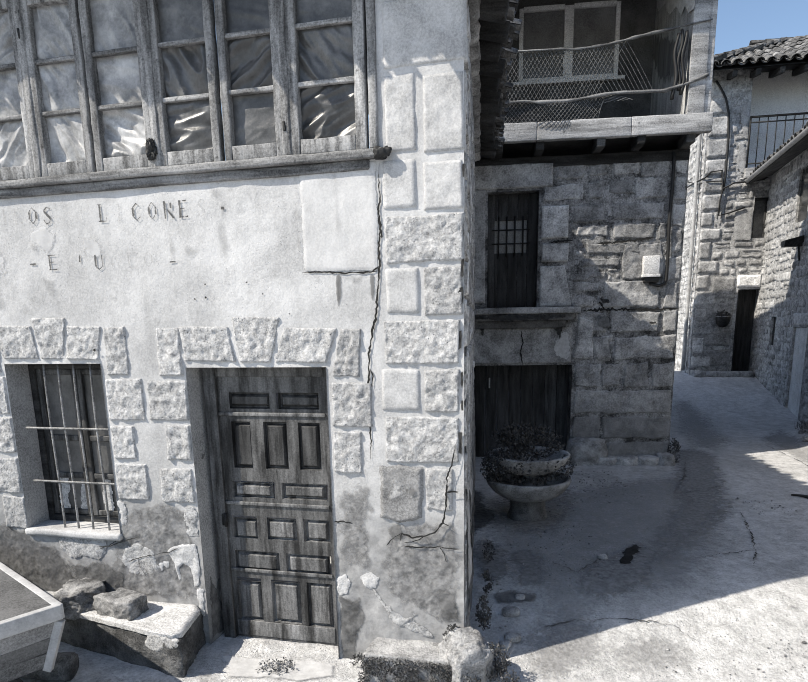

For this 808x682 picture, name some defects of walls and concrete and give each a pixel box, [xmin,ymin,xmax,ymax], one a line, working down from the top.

crack [302,174,383,386]
damp [0,524,76,592]
spalling [58,500,205,616]
spalling [336,488,458,638]
crack [387,450,457,561]
peeling [459,432,473,590]
damp [339,597,364,659]